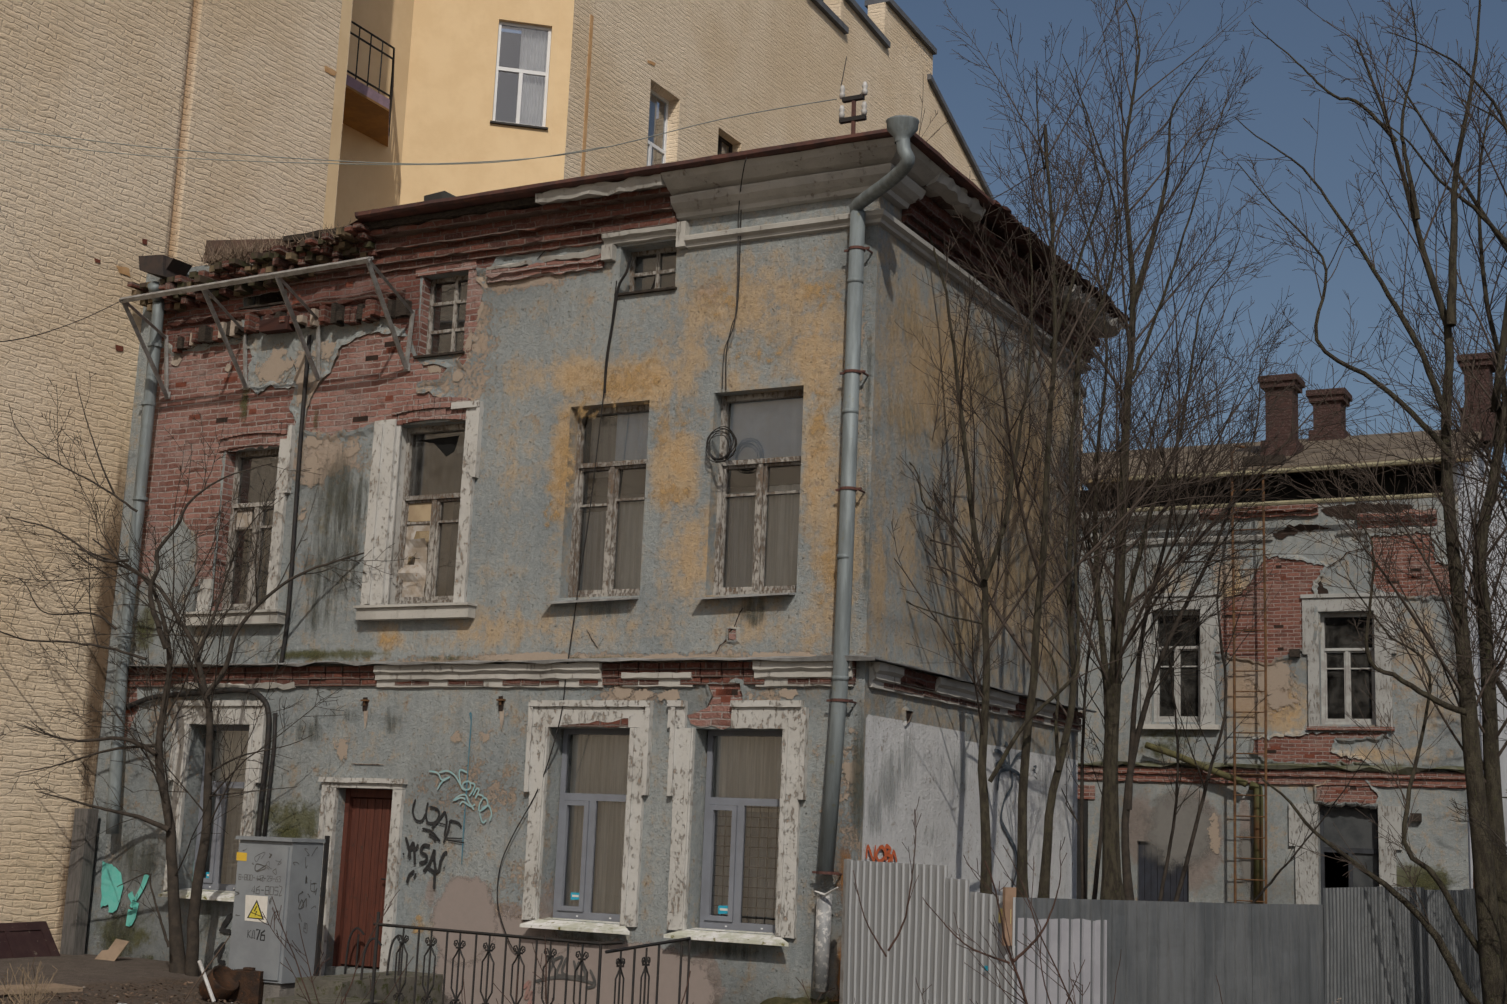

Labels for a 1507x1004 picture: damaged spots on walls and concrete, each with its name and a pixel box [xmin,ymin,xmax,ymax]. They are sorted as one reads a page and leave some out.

flaking render [136,256,506,596]
flaking render [1364,526,1451,603]
flaking render [1211,502,1415,711]
water stain [277,650,321,659]
peeling [470,651,588,663]
flaking render [613,625,817,730]
flaking render [1248,726,1391,809]